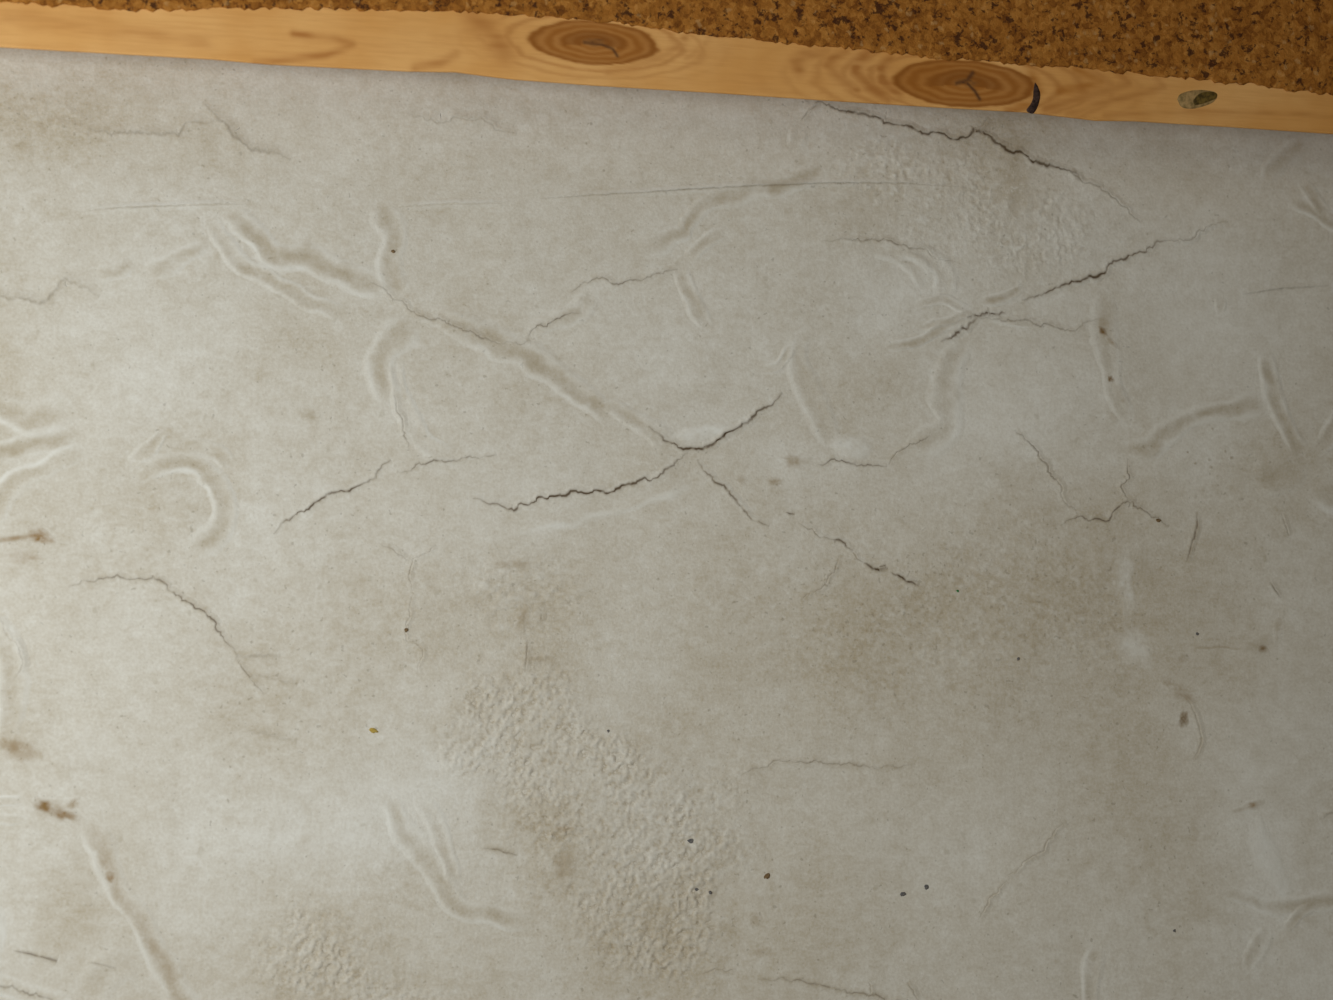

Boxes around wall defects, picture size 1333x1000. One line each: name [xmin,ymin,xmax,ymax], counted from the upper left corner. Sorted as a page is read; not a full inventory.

crack [368,265,679,350]
crack [796,99,1227,347]
crack [271,390,932,604]
crack [1012,427,1171,530]
crack [68,569,298,748]
crack [0,980,63,1000]